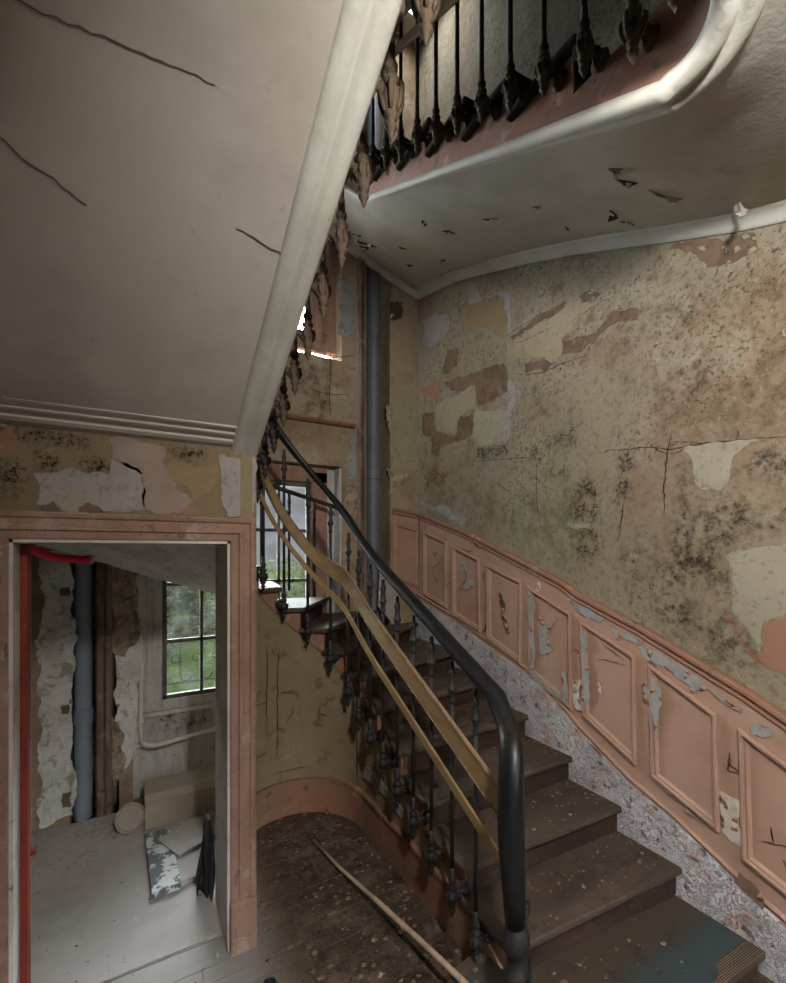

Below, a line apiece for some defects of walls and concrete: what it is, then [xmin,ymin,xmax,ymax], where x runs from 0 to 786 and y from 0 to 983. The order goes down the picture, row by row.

crack [19,0,215,85]
peeling [386,281,639,495]
peeling [33,436,194,515]
peeling [219,454,240,518]
leakage [566,482,598,564]
crack [591,430,786,511]
leakage [657,503,746,584]
peeling [682,439,759,491]
peeling [723,544,786,676]
peeling [111,566,142,788]
peeling [570,600,742,736]
peeling [731,872,767,929]